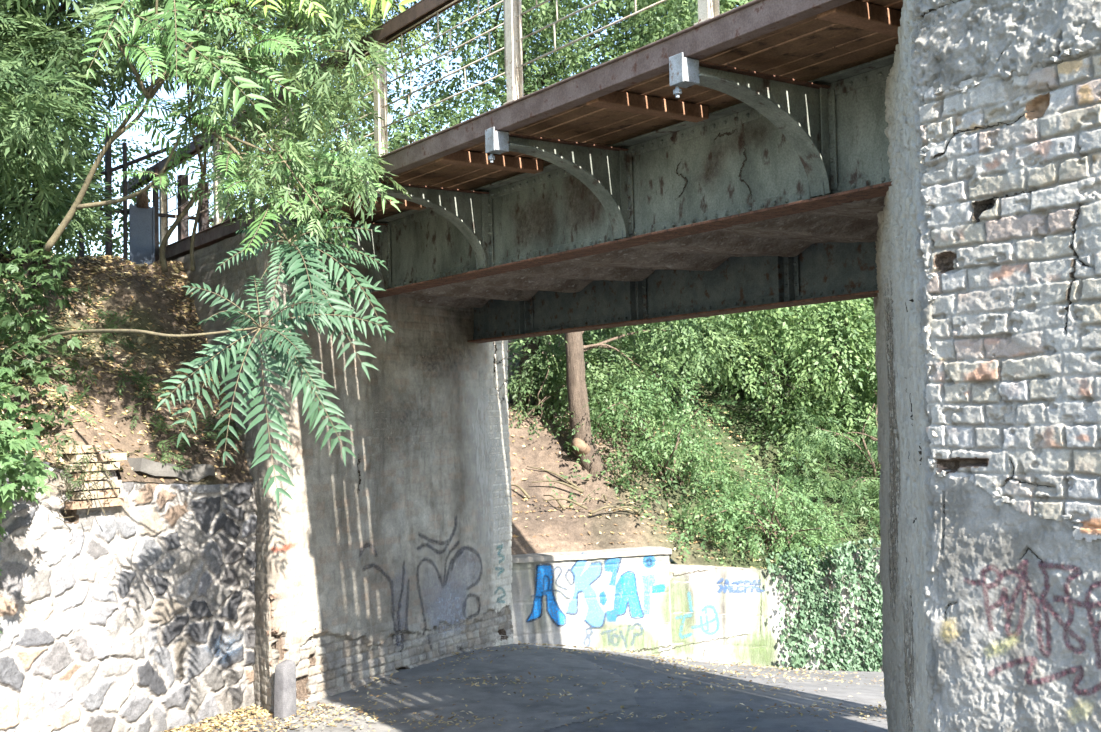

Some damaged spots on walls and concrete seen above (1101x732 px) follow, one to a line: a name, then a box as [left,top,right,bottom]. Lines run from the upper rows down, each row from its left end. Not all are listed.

flaking render [908,39,1101,542]
crack [1064,203,1089,332]
flaking render [266,590,513,704]